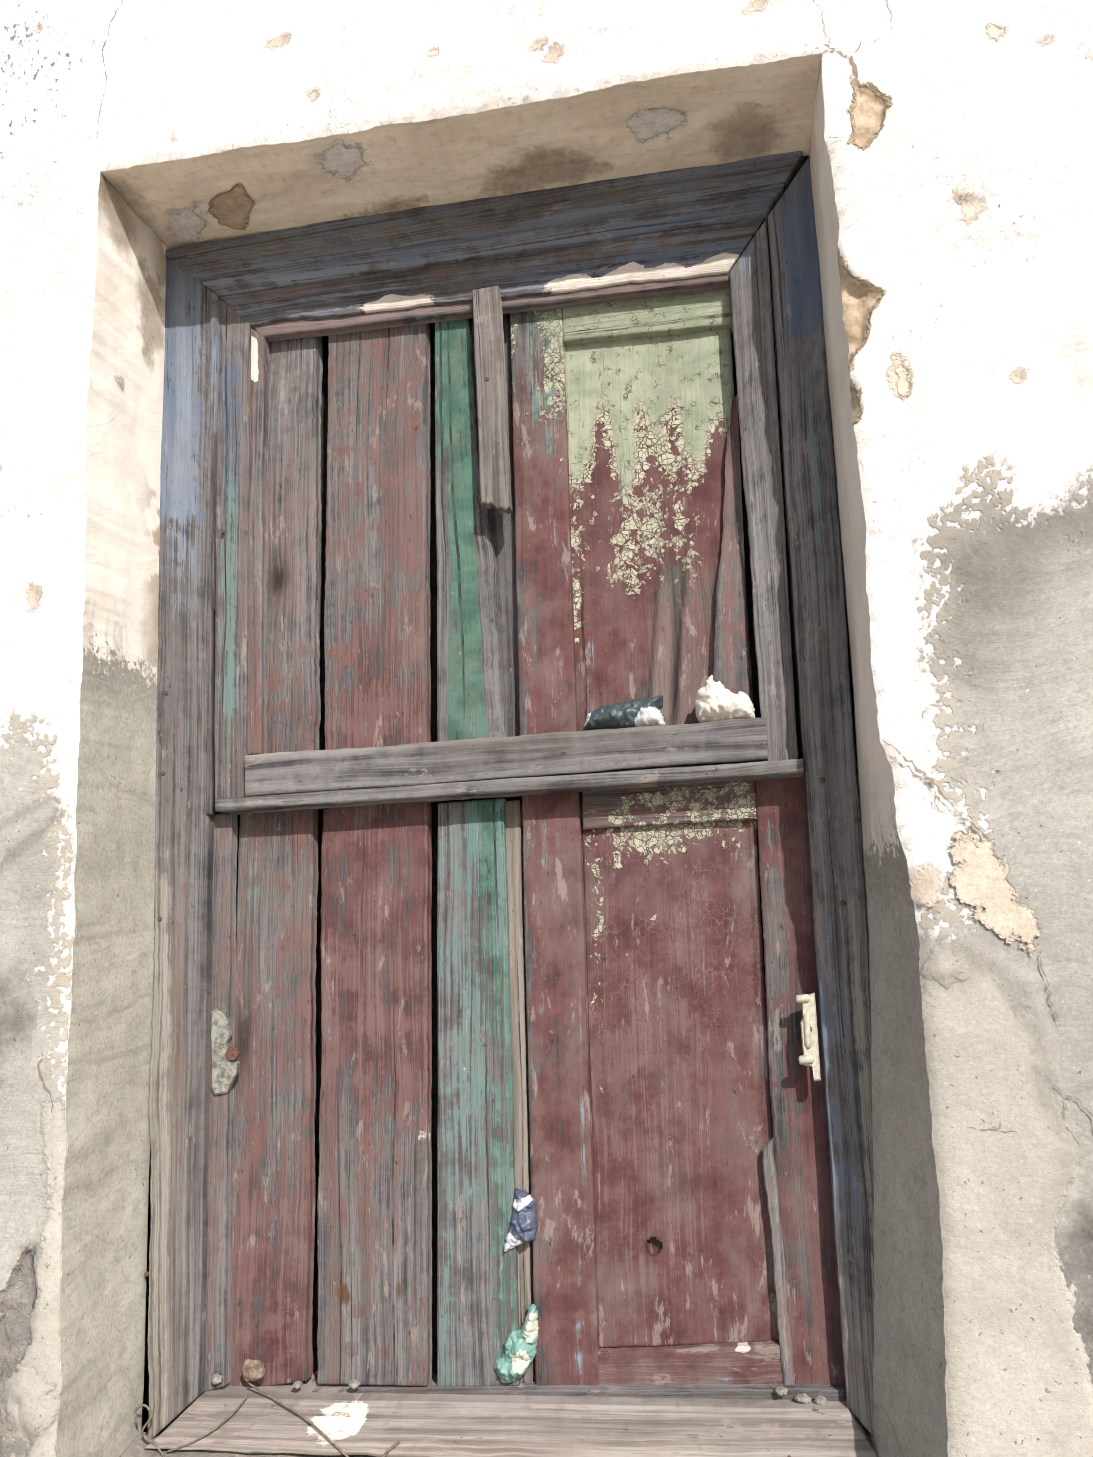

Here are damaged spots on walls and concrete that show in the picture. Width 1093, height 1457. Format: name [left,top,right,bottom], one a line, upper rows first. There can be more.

crack [96,0,123,156]
crack [813,0,892,78]
spalling [846,75,893,150]
peeling [208,184,255,230]
spalling [837,241,886,426]
spalling [25,581,43,613]
peeling [908,451,1093,1384]
peeling [0,712,74,1457]
crack [0,1242,30,1454]